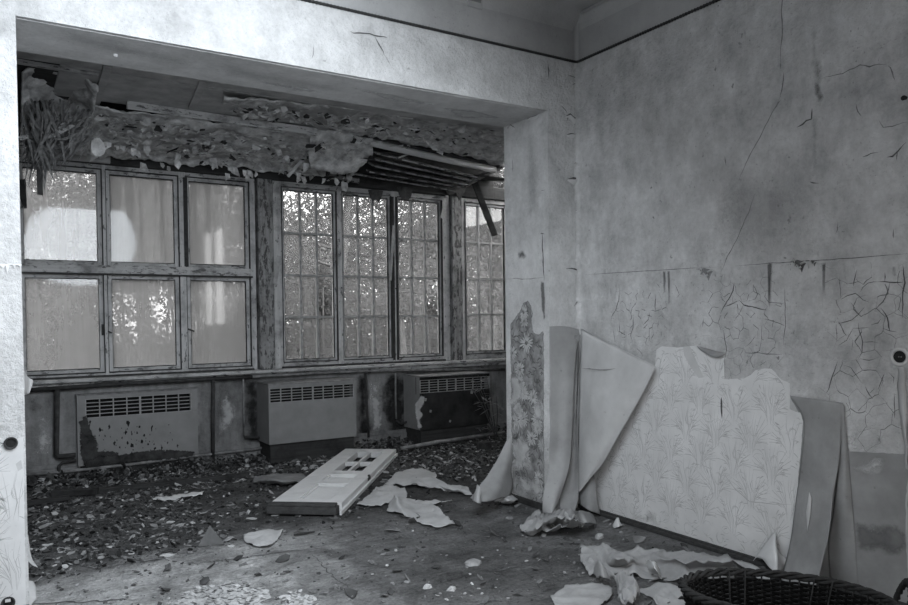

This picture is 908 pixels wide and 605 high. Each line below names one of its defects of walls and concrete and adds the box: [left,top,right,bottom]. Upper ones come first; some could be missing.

crack [352,32,389,62]
crack [824,64,895,79]
peeling [94,105,502,183]
crack [856,105,905,160]
crack [699,0,786,378]
crack [610,283,679,354]
crack [820,260,908,452]
water stain [857,527,905,553]